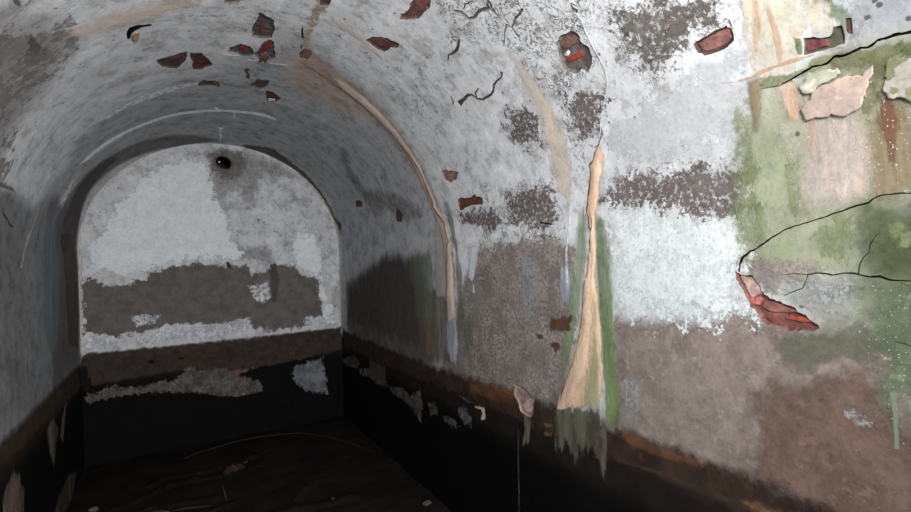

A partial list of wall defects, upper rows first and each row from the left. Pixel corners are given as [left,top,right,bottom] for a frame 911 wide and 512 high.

water stain [301,0,329,50]
crack [450,71,503,106]
crack [447,0,524,60]
spalling [556,31,614,148]
peeling [599,0,734,83]
spalling [803,18,853,55]
peeling [798,65,874,120]
crack [762,30,911,89]
water stain [304,55,458,364]
crack [738,192,911,272]
water stain [0,145,911,512]
peeling [608,249,911,497]